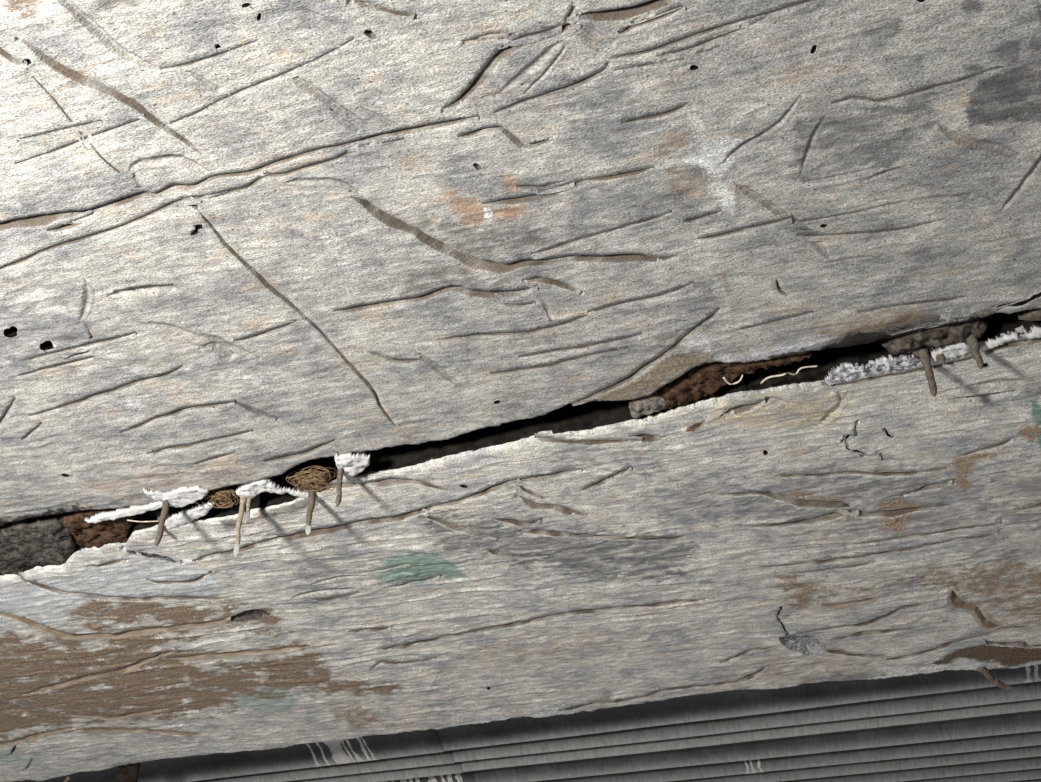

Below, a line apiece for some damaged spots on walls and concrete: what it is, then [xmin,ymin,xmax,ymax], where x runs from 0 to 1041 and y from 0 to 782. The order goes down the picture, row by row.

leakage [825,325,1041,386]
crack [844,422,892,461]
crack [126,549,180,565]
crack [775,609,788,633]